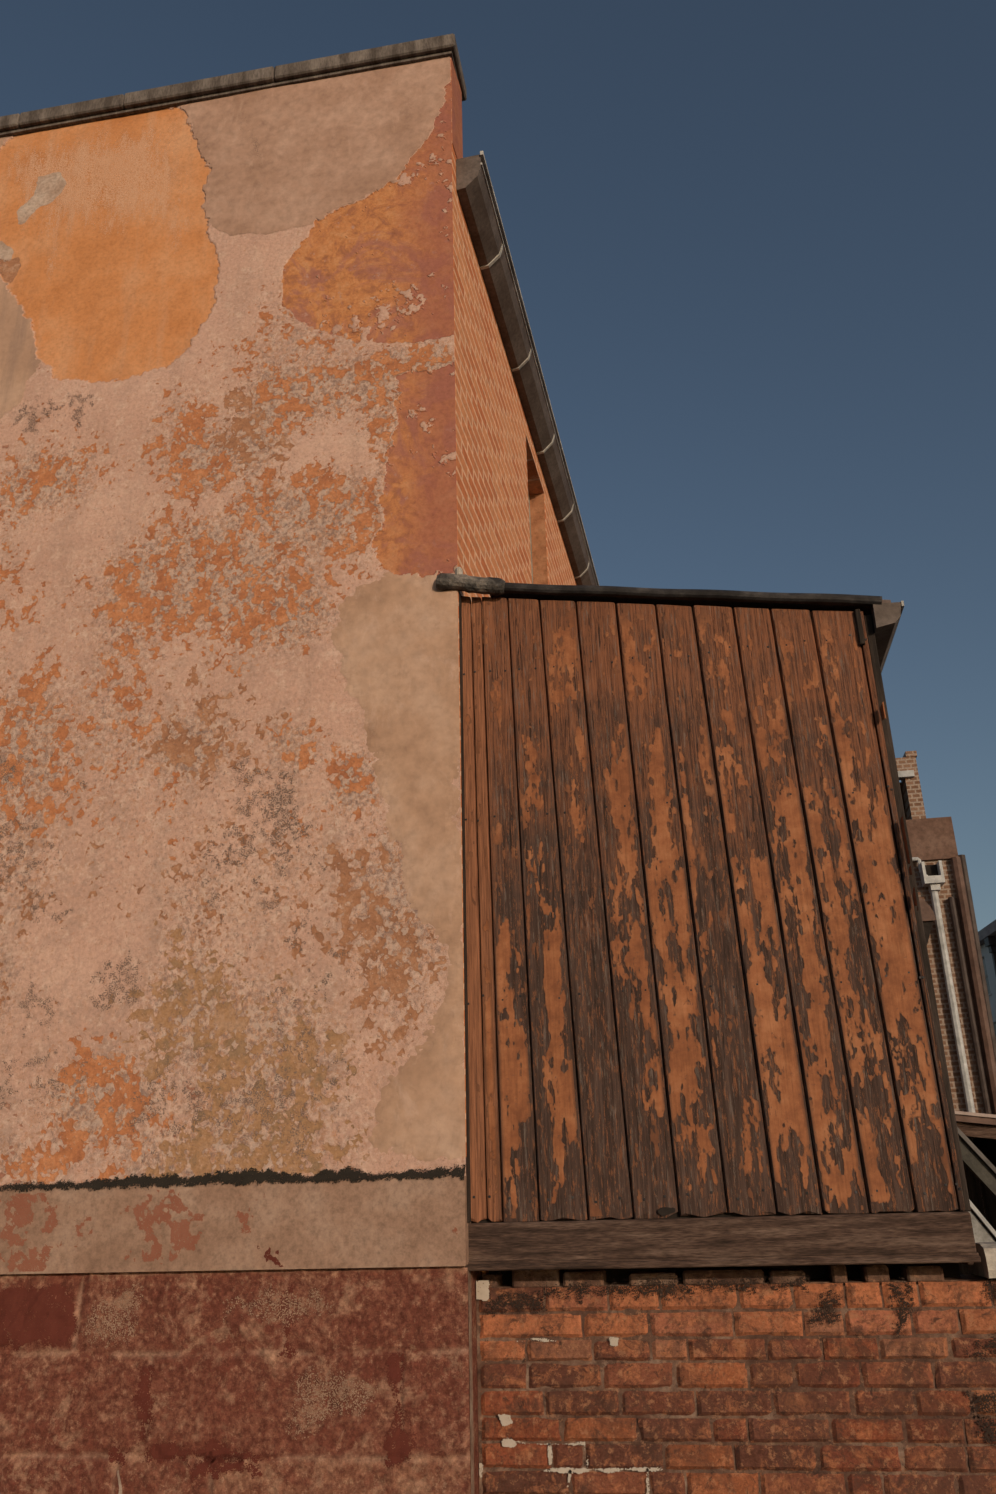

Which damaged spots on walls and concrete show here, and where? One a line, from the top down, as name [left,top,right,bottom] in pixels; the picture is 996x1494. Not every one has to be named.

peeling [0,82,458,1272]
peeling [462,599,960,1218]
spalling [77,1282,144,1349]
spalling [222,1208,339,1327]
crack [115,1470,123,1494]